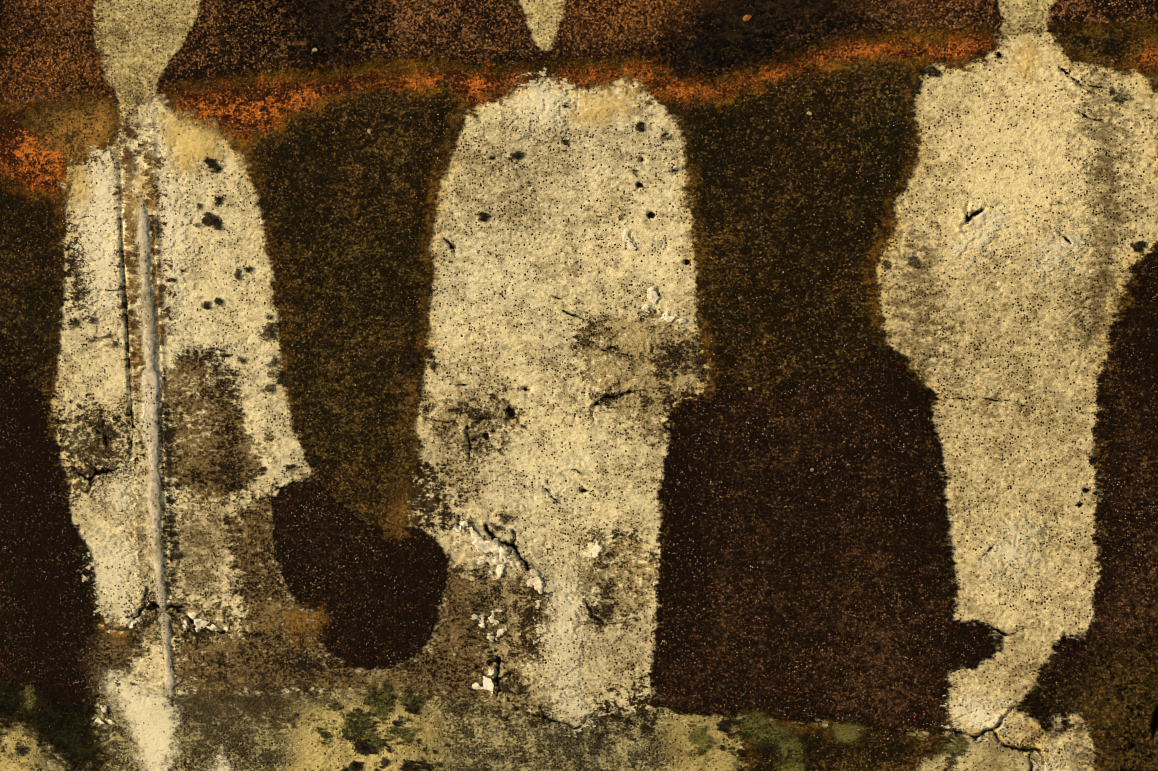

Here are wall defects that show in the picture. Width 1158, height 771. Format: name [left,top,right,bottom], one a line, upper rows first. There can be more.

rust [1121,23,1158,78]
crack [457,516,529,570]
flaking render [453,519,555,737]
crack [952,705,1046,771]
crack [1104,661,1158,771]